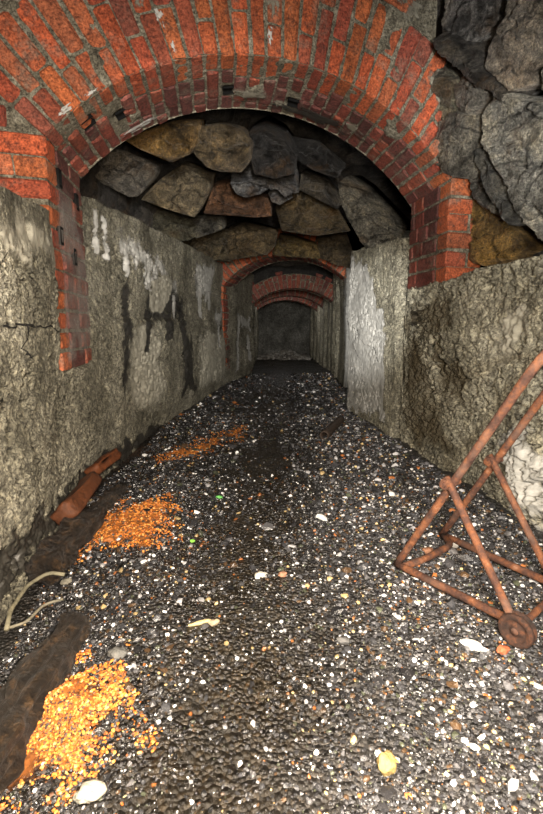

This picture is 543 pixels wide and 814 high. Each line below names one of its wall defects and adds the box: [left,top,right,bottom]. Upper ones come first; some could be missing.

water stain [91,210,110,260]
crack [3,323,60,359]
water stain [120,240,197,398]